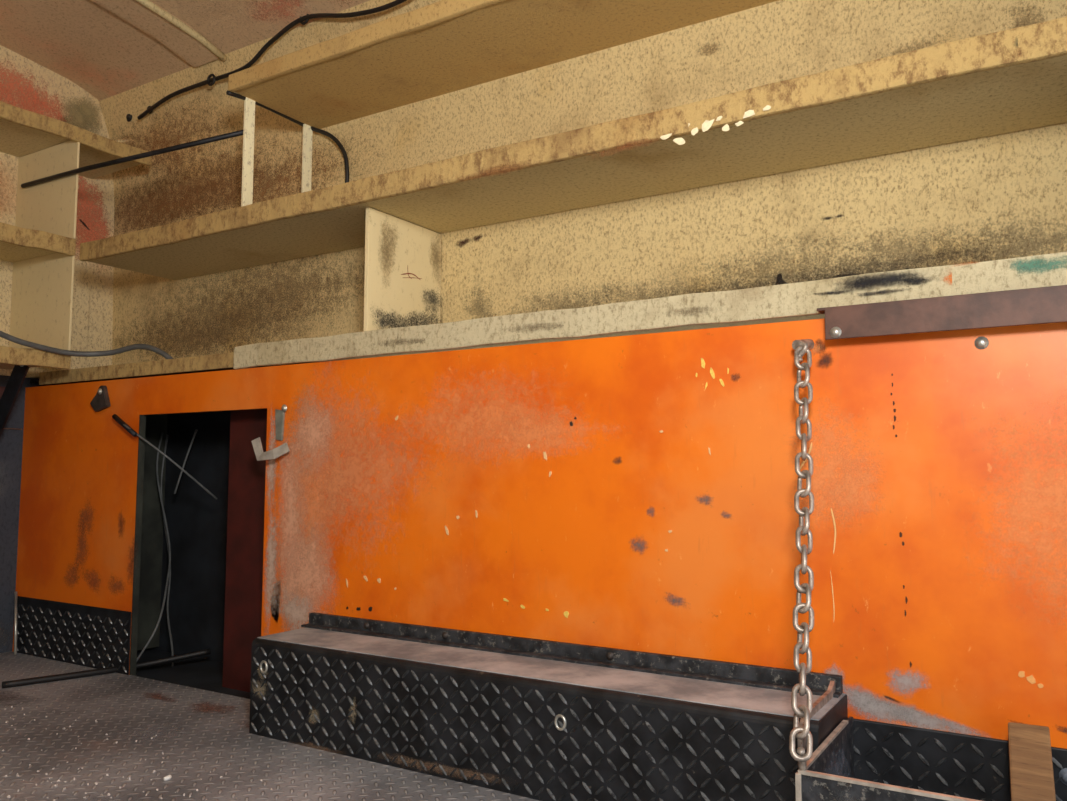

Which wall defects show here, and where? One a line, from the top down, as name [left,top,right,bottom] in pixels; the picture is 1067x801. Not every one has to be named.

damp [381,228,393,267]